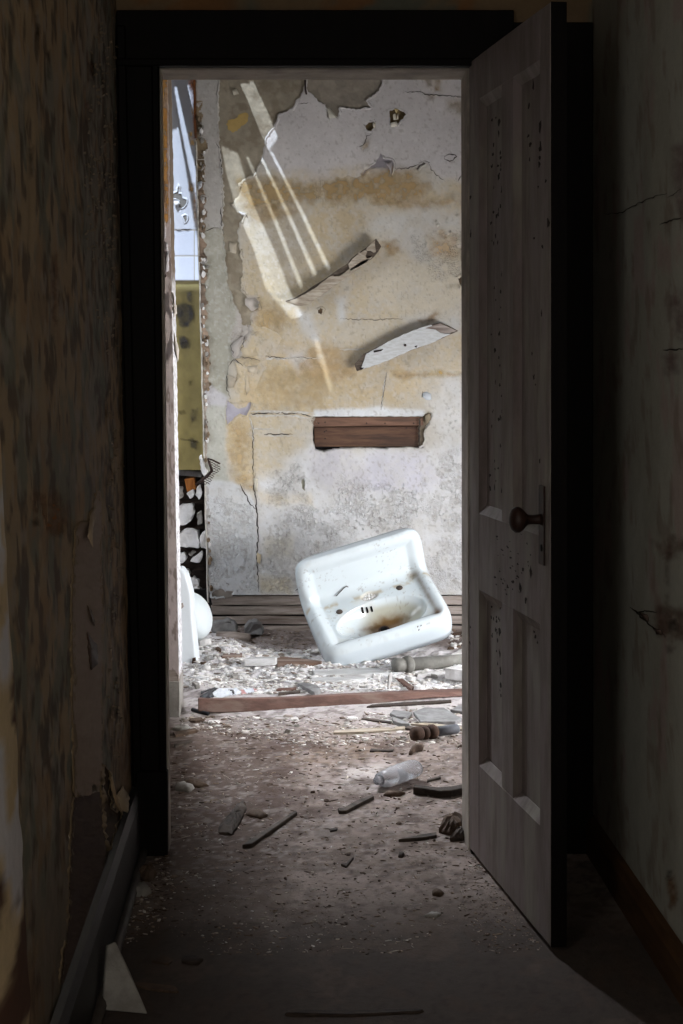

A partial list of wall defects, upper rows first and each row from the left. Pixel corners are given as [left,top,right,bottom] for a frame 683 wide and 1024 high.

spalling [388,107,408,129]
peeling [362,154,396,176]
damp [241,170,422,206]
peeling [173,80,384,599]
crack [240,410,314,592]